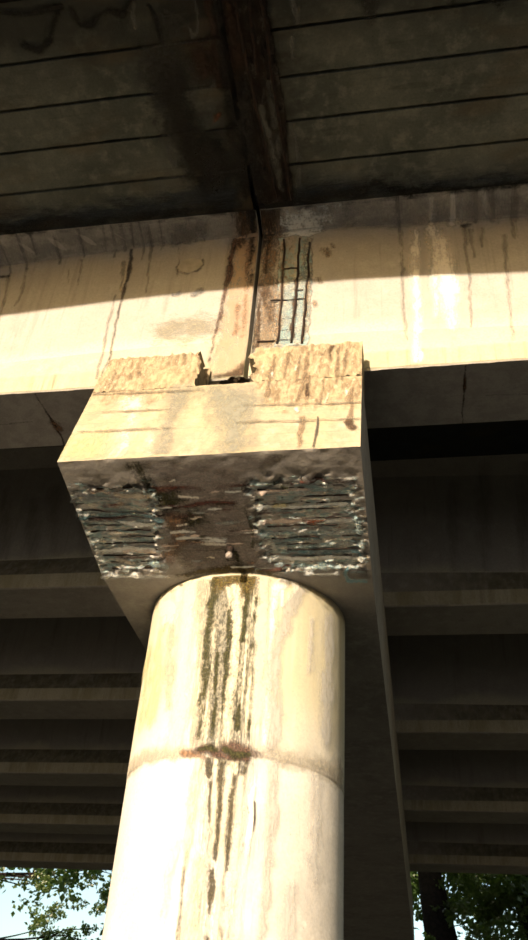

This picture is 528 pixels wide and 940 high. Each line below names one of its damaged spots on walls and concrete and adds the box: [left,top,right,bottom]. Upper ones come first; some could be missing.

corrosion [212,208,348,403]
spalling [257,234,313,347]
damp [280,121,528,363]
damp [110,396,142,457]
corrosion [344,388,357,430]
crack [459,366,467,417]
spalling [67,475,369,579]
damp [128,388,344,940]